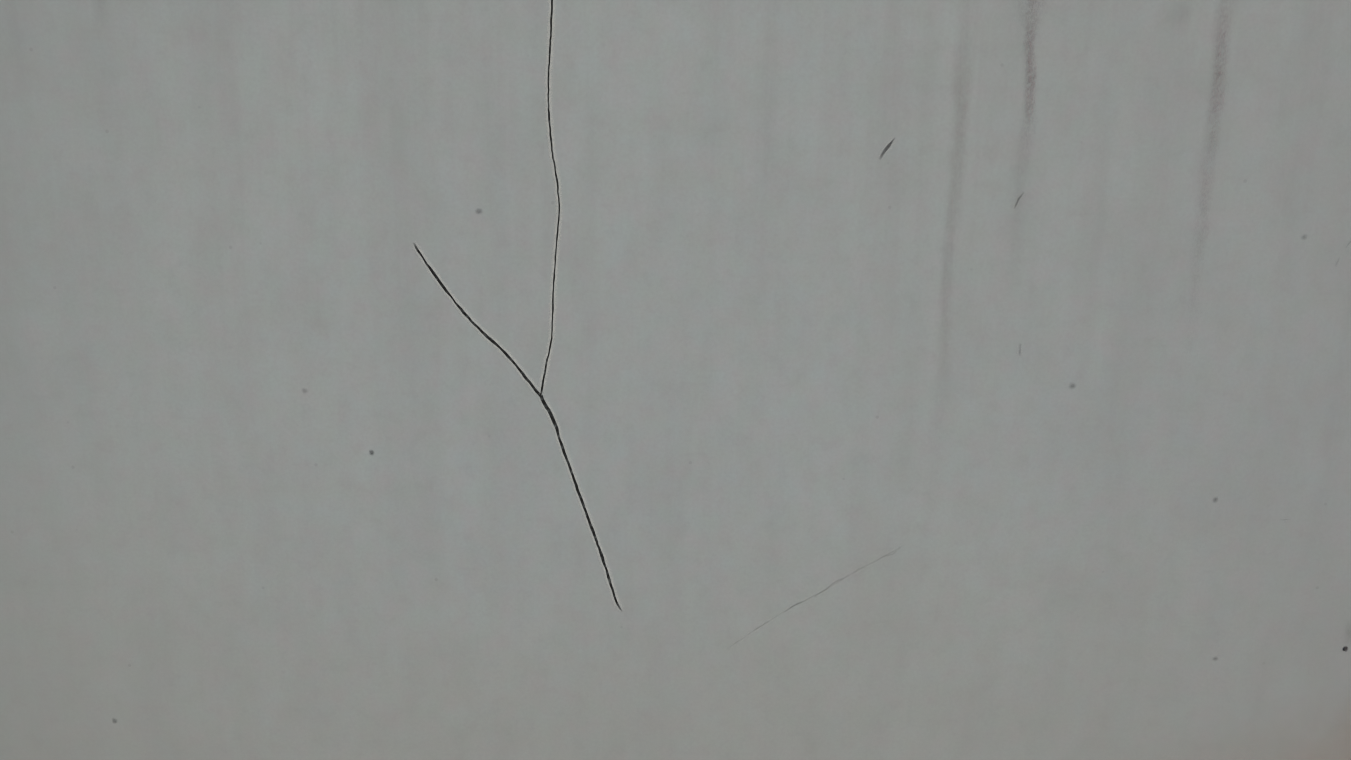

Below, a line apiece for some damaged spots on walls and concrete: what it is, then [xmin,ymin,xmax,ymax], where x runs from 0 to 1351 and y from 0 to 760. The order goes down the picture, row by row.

crack [414,0,620,608]